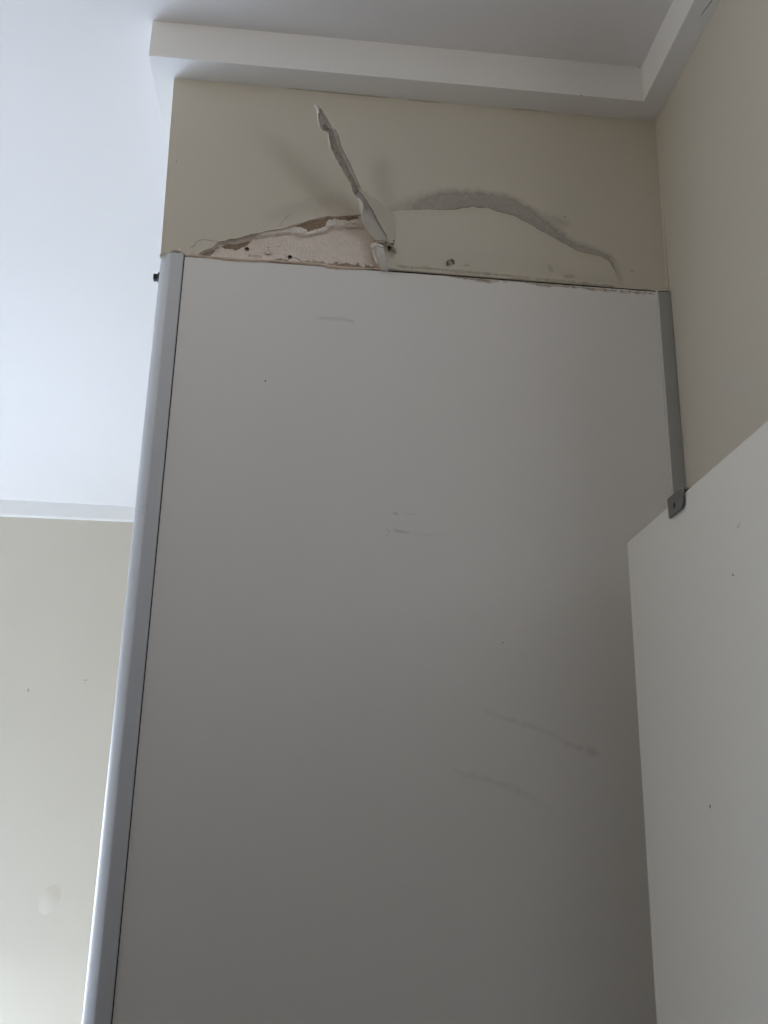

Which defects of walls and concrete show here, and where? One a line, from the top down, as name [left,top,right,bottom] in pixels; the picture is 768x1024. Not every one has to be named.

flaking render [201,104,397,272]
crack [388,271,655,292]